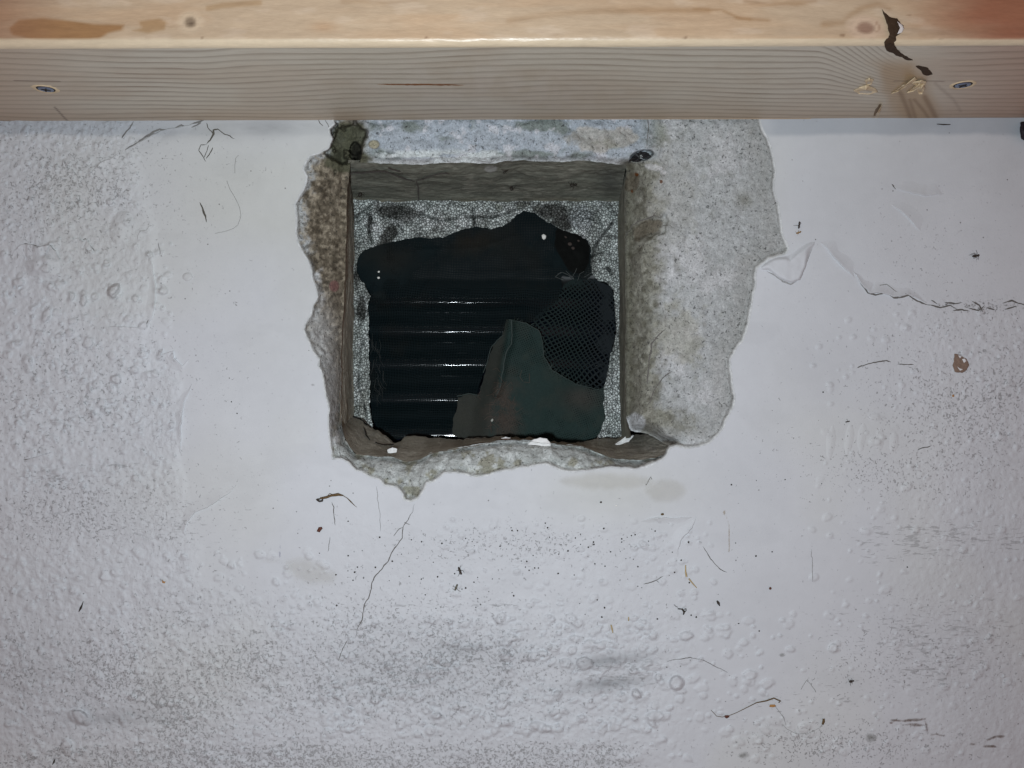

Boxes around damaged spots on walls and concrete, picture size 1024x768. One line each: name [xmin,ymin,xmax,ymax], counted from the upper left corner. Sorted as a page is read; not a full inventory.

spalling [294,119,854,502]
crack [853,272,1024,312]
crack [338,486,413,661]